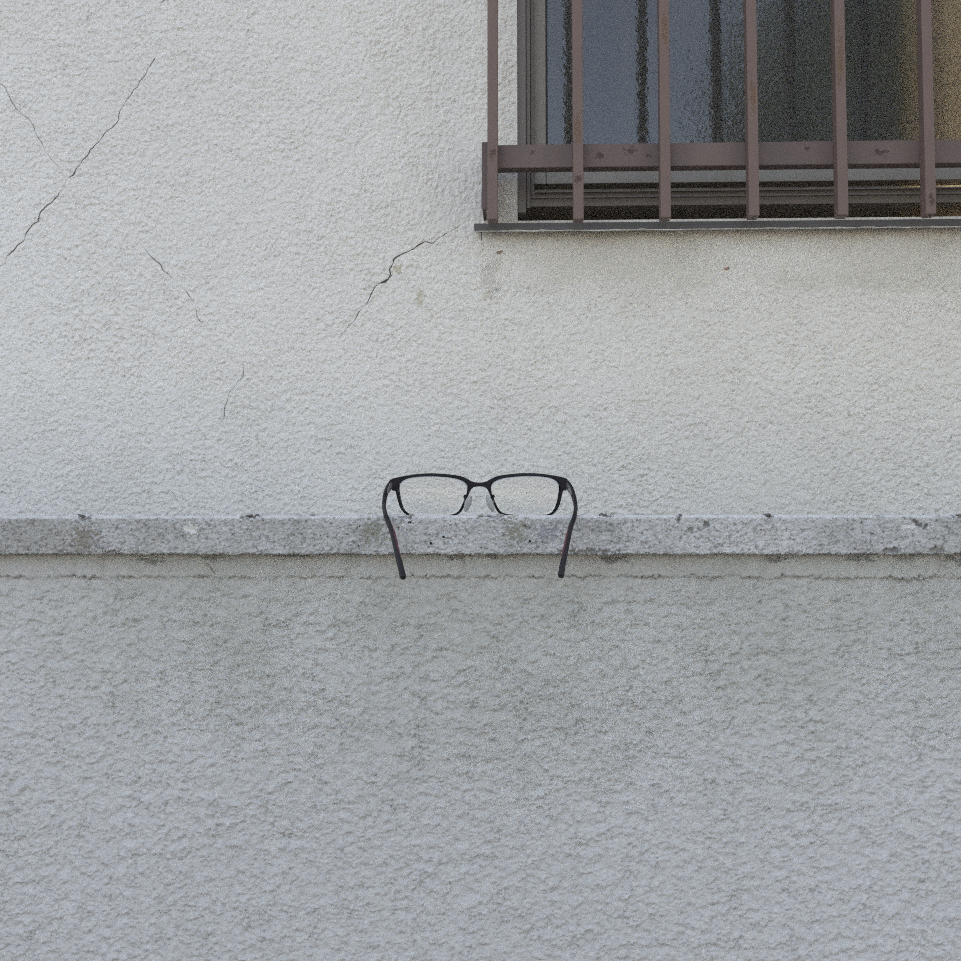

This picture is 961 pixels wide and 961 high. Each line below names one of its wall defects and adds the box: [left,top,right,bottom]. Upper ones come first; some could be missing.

crack [0,57,156,266]
crack [347,226,459,328]